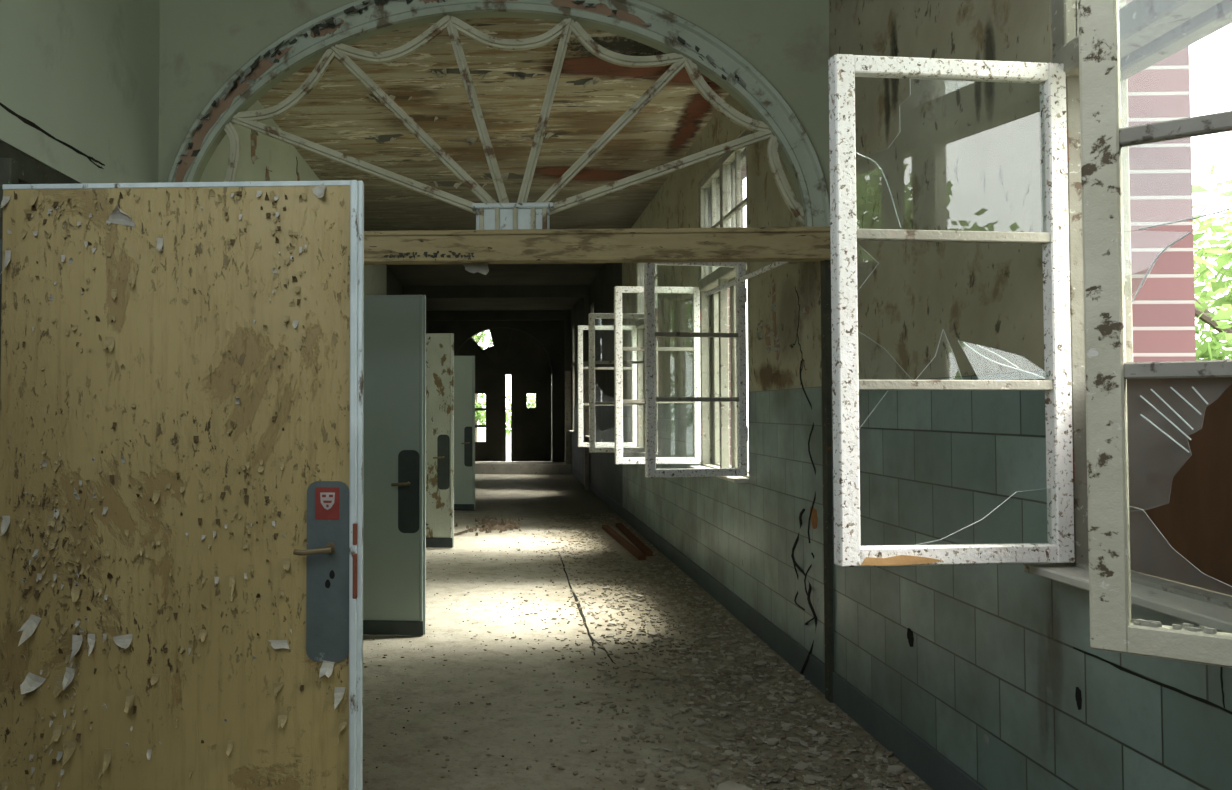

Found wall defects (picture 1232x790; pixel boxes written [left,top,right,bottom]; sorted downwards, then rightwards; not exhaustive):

crack [0,102,105,169]
flaking render [166,0,386,202]
peeling [429,68,546,81]
peeling [669,36,747,88]
peeling [0,191,140,301]
peeling [201,130,326,381]
peeling [1,449,137,790]
peeling [185,488,289,633]
crack [558,552,615,664]